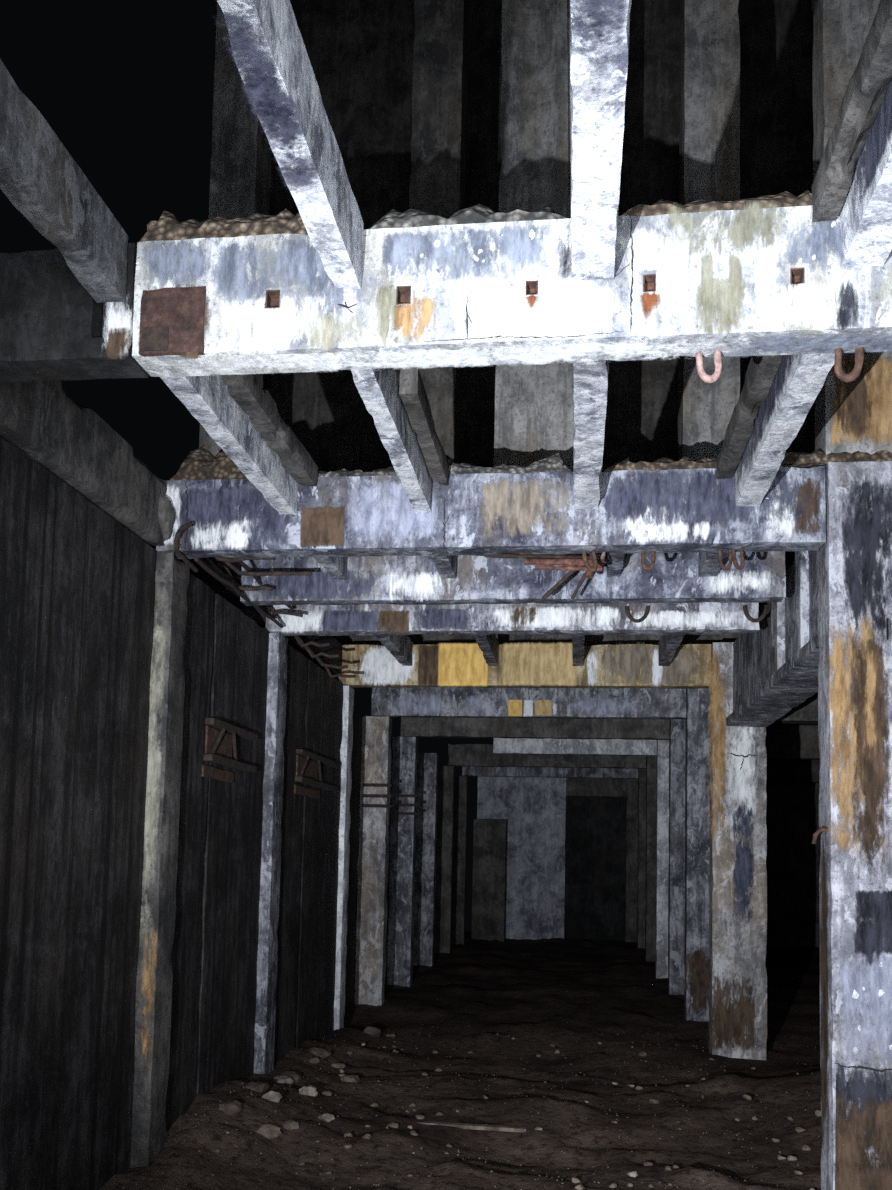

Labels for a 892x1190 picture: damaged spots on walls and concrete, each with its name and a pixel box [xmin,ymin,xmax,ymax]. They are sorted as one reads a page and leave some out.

rust [641,293,659,315]
rust [831,356,892,444]
rust [174,522,198,572]
rust [472,552,606,600]
water stain [842,480,892,648]
water stain [835,1066,892,1190]